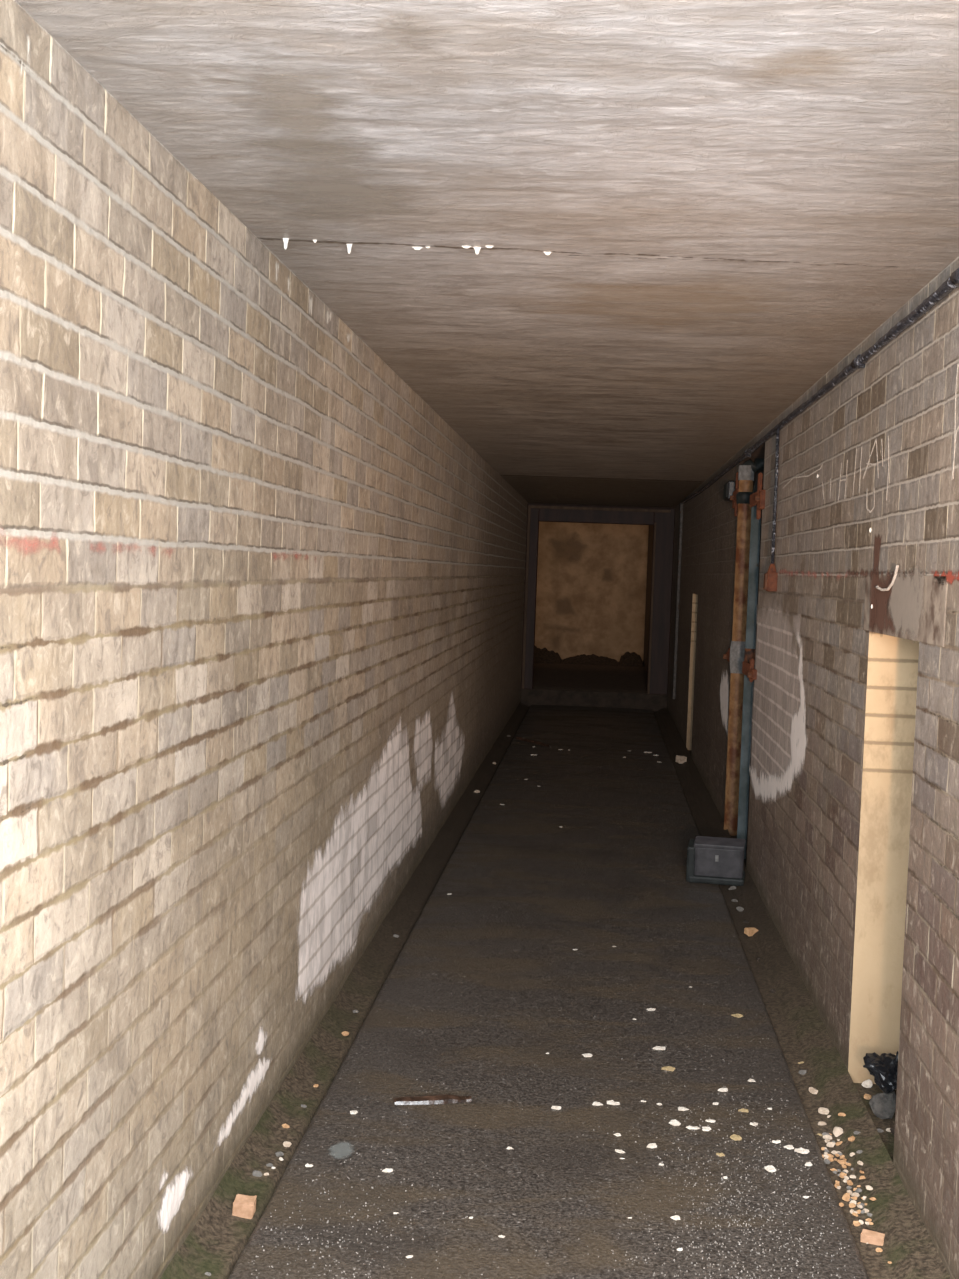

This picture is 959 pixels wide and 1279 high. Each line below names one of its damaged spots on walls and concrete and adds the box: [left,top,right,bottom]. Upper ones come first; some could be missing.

damp [720,670,729,736]
damp [749,608,806,804]
damp [298,694,464,1002]